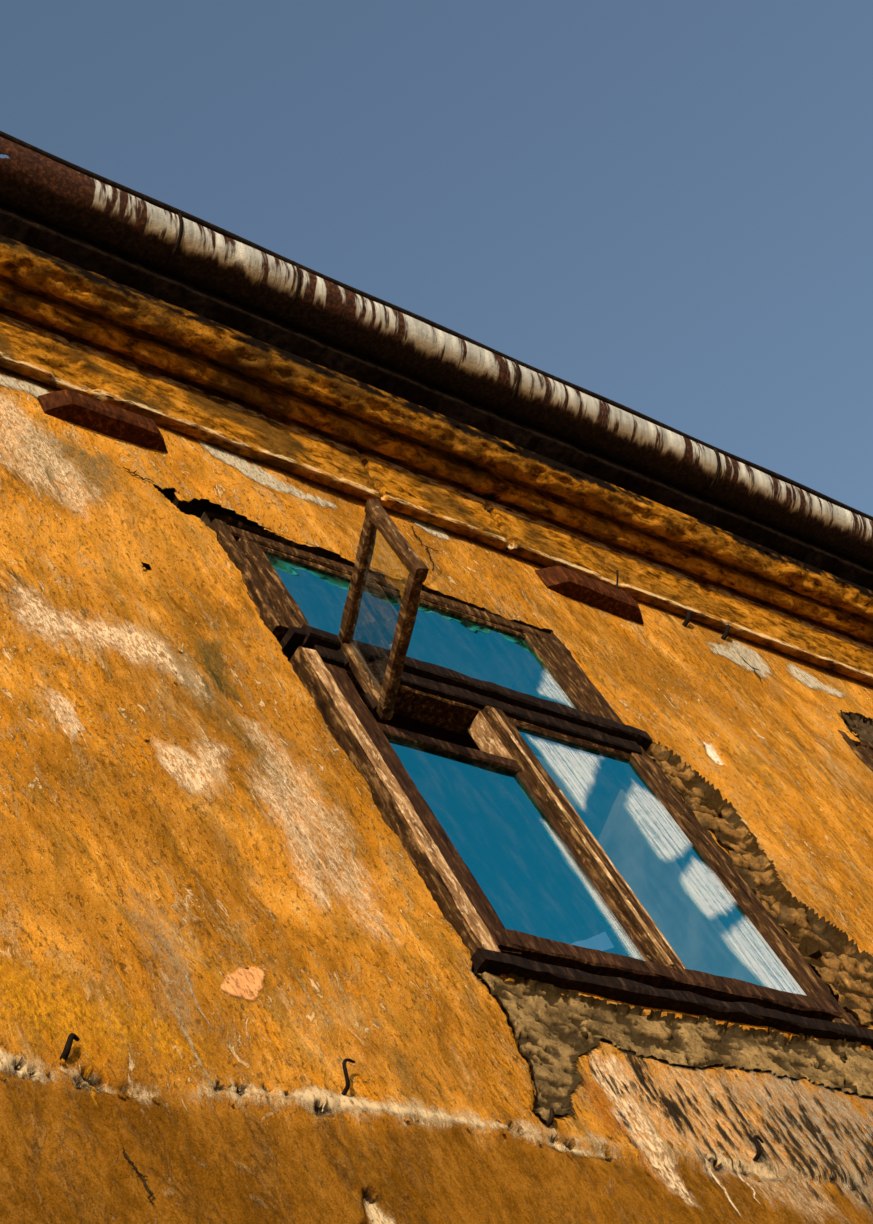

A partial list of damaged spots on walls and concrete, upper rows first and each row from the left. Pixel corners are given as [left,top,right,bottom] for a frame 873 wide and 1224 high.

flaking render [0,374,47,397]
flaking render [646,741,873,1026]
flaking render [221,961,264,1000]
flaking render [0,1048,159,1104]
flaking render [197,969,873,1206]
flaking render [363,1186,395,1224]